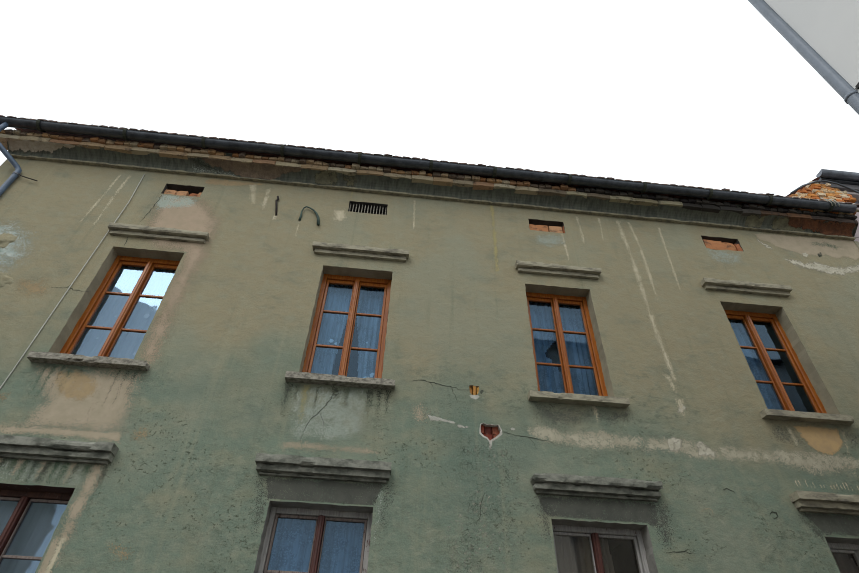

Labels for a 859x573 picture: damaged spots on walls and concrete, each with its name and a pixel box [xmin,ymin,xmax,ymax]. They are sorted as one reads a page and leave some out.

damp [616,221,686,417]
crack [300,388,337,441]
spalling [479,423,502,448]